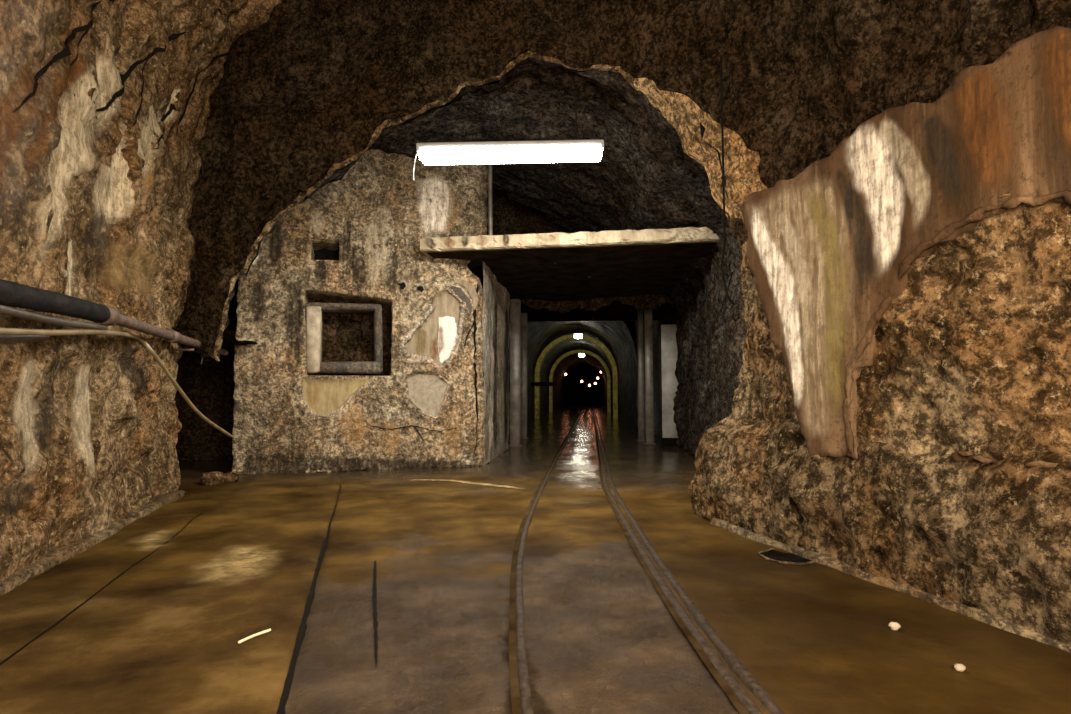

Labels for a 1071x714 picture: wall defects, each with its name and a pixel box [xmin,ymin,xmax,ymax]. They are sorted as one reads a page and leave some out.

peeling [398,279,478,419]
spalling [843,190,1071,474]